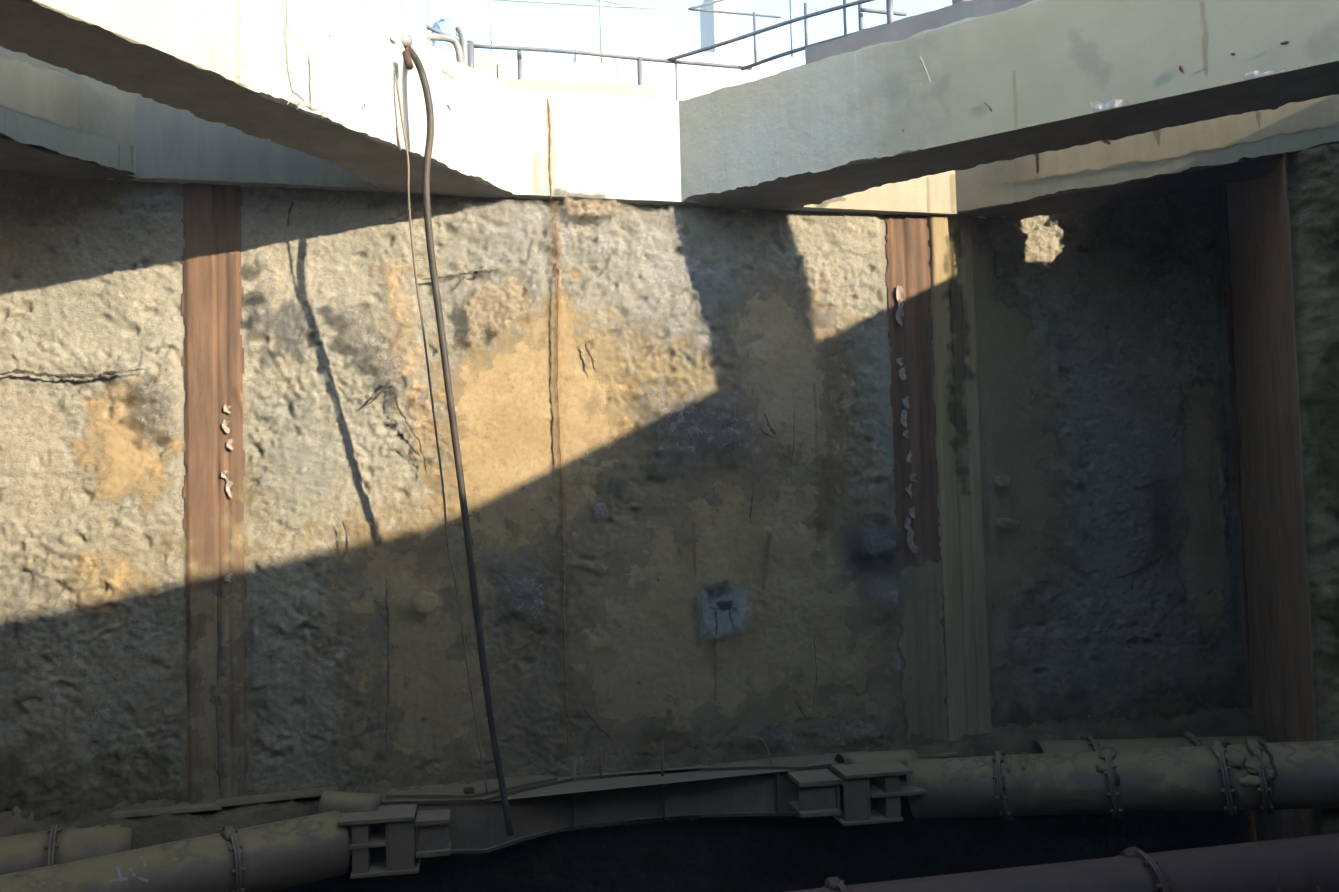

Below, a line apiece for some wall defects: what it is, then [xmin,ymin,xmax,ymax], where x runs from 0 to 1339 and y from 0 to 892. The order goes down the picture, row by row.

spalling [699,580,752,643]